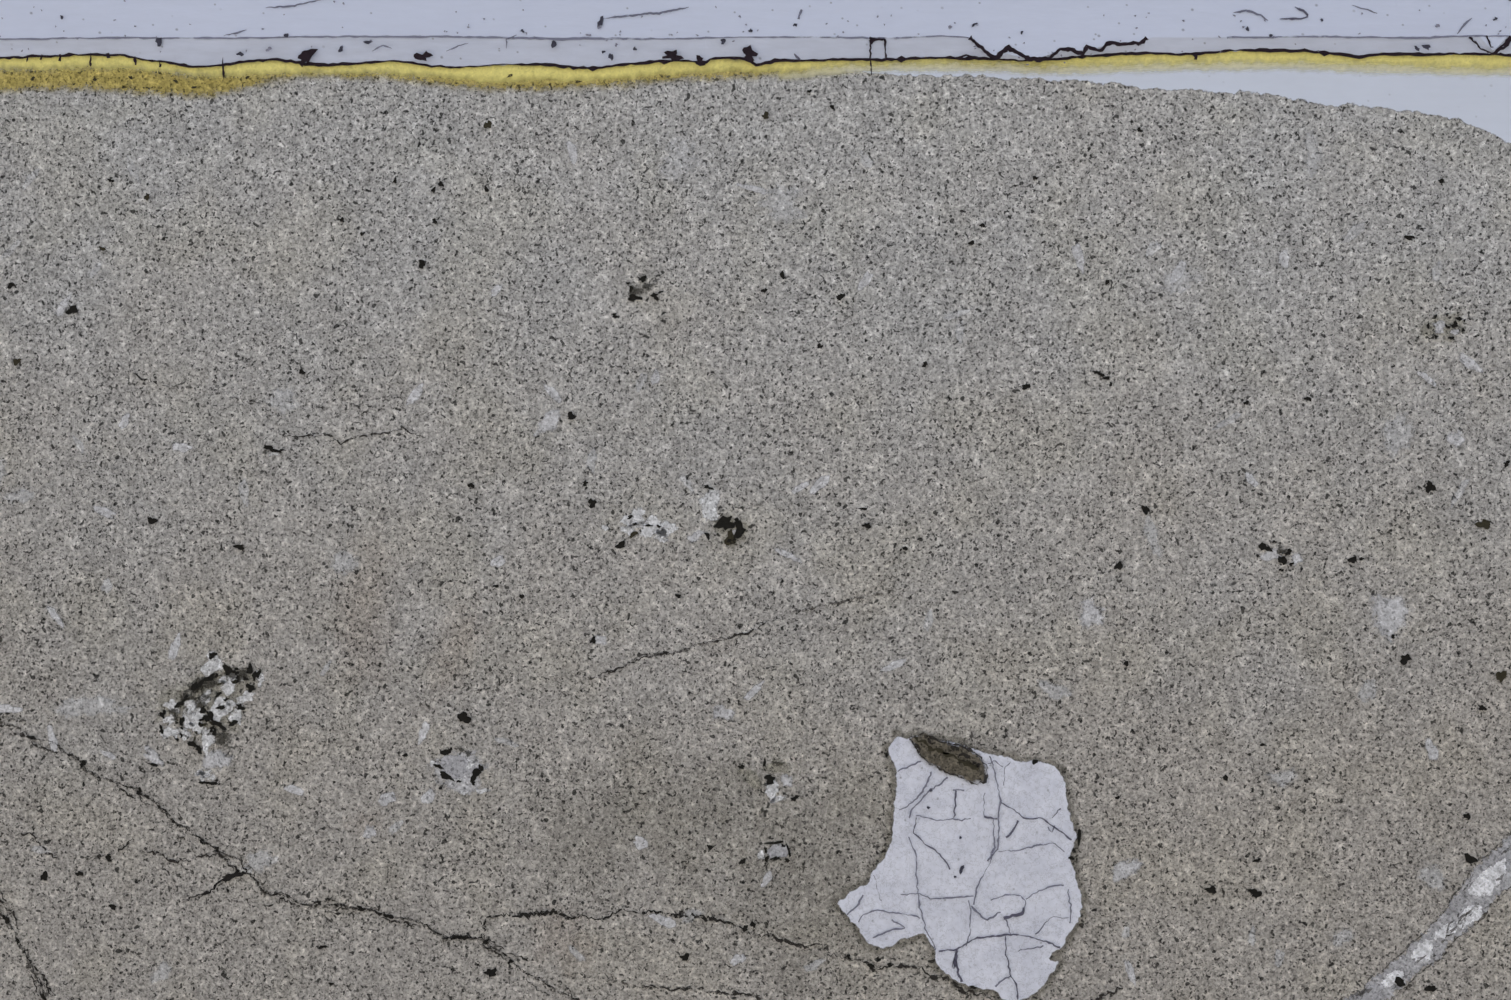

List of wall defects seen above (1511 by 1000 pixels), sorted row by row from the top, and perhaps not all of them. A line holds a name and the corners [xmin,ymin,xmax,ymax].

peeling [847,67,1511,143]
crack [467,584,916,694]
spalling [144,651,265,785]
crack [0,712,991,1000]
spalling [838,732,1082,1000]
crack [1339,831,1511,1000]
crack [1091,987,1123,1000]